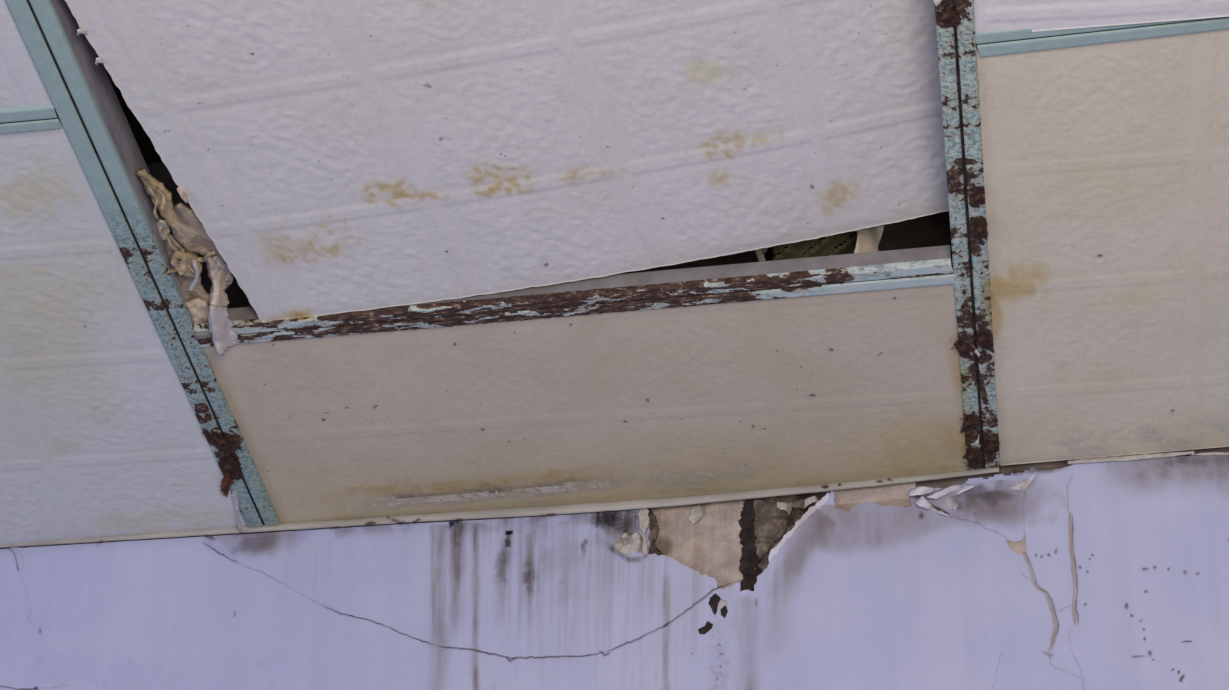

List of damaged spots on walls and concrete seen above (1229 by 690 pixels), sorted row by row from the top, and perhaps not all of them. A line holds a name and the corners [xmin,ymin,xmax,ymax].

rust [937,6,959,28]
rust [971,186,988,245]
rust [951,330,995,359]
rust [199,413,243,497]
rust [960,413,1001,469]
spalling [611,482,975,634]
crack [1005,535,1026,554]